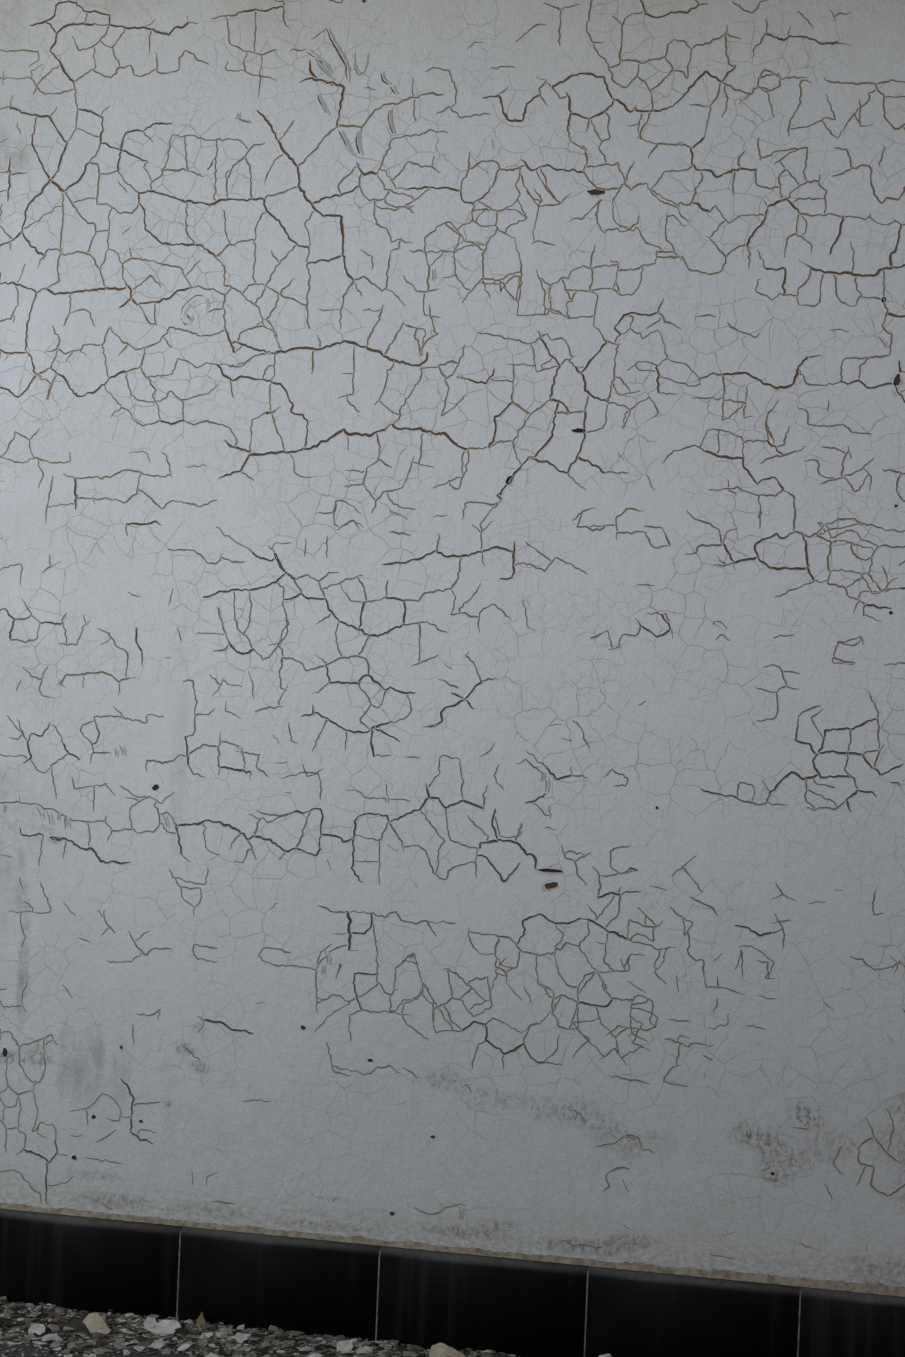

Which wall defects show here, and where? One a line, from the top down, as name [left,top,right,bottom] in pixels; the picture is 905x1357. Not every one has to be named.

peeling [307,27,399,134]
peeling [339,128,364,157]
crack [0,0,905,948]
crack [80,909,218,964]
crack [257,751,842,1093]
crack [849,955,903,974]
crack [182,1002,265,1060]
crack [0,980,161,1204]
crack [192,1172,235,1204]
crack [413,1204,465,1215]
crack [569,1109,654,1192]
crack [825,1109,905,1199]